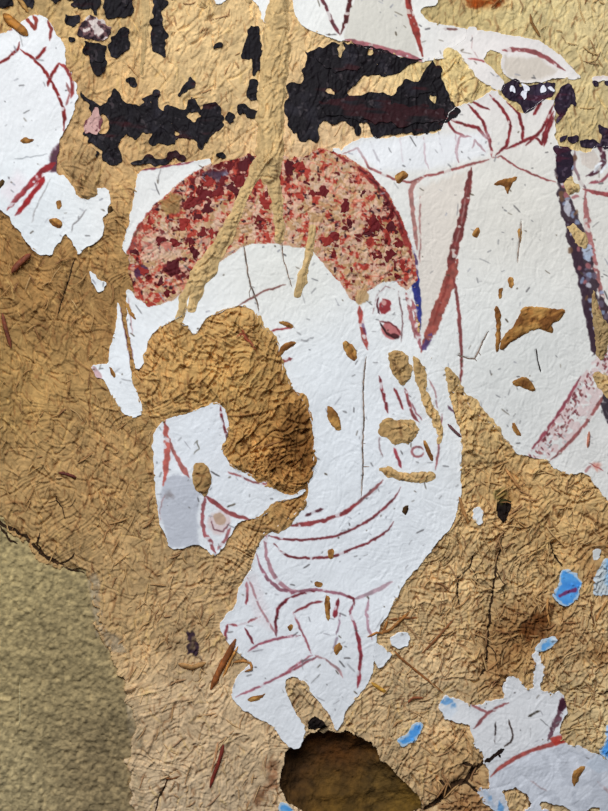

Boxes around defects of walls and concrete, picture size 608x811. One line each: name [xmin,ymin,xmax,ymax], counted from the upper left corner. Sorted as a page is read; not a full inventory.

spalling [378,350,443,461]
spalling [444,367,515,464]
flaking render [512,377,536,392]
spalling [593,372,608,398]
spalling [140,305,317,588]
spalling [379,466,436,483]
crack [0,520,85,573]
peeling [552,569,582,606]
peeling [397,722,423,747]
crack [421,748,504,810]